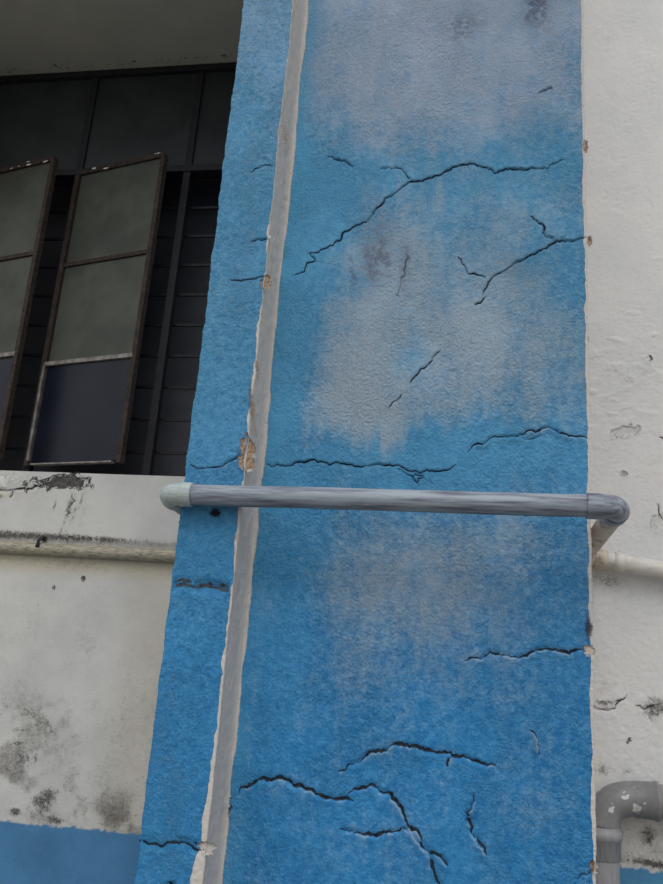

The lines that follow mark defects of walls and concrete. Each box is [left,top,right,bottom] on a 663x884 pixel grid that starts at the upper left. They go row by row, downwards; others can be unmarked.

crack [327,153,355,167]
crack [295,156,563,275]
crack [458,216,587,305]
spalling [237,432,256,473]
crack [266,427,589,485]
spalling [22,472,94,492]
crack [463,648,595,668]
crack [527,730,540,758]
damp [33,789,61,823]
crack [226,742,497,884]
crack [139,835,204,852]